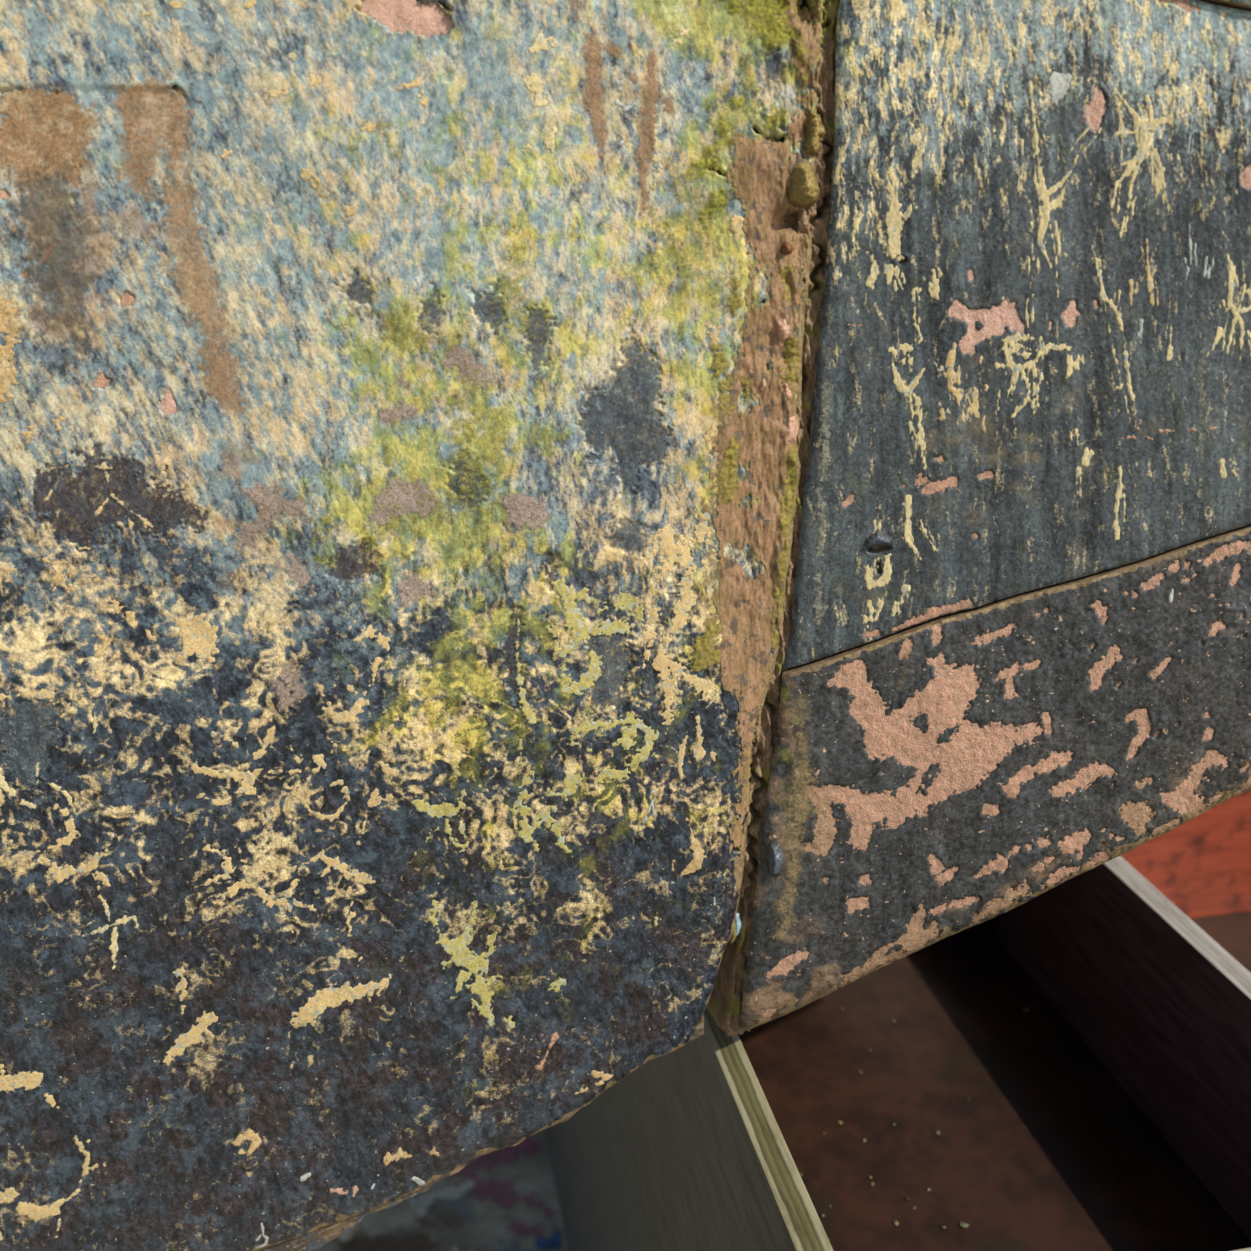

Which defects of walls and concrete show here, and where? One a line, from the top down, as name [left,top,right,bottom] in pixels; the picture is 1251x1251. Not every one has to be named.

corrosion [0,87,100,186]
corrosion [583,32,675,209]
crack [753,127,785,142]
corrosion [112,74,246,413]
peeling [865,67,1193,562]
peeling [0,683,139,969]
peeling [191,717,351,840]
peeling [195,844,376,937]
peeling [288,956,392,1038]
peeling [428,892,515,1029]
peeling [800,553,1053,857]
peeling [833,708,1251,989]